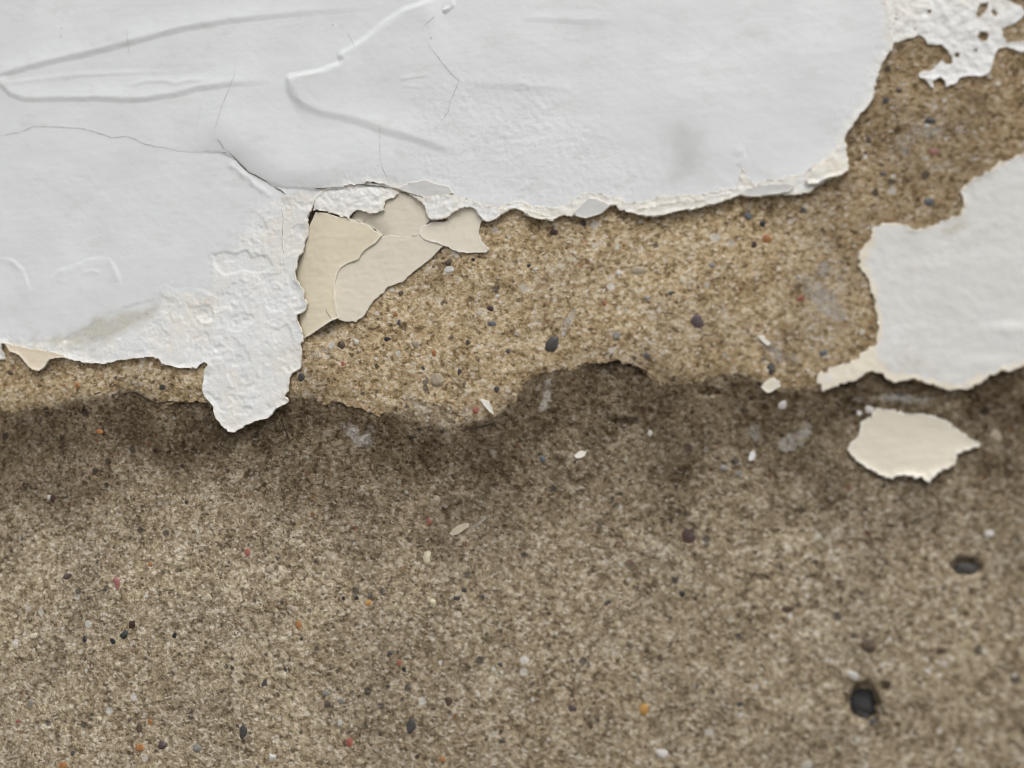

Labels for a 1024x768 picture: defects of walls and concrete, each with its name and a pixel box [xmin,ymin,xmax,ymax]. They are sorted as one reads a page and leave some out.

crack [0,70,287,265]
crack [312,146,410,196]
peeling [0,0,1024,433]
peeling [848,408,980,482]